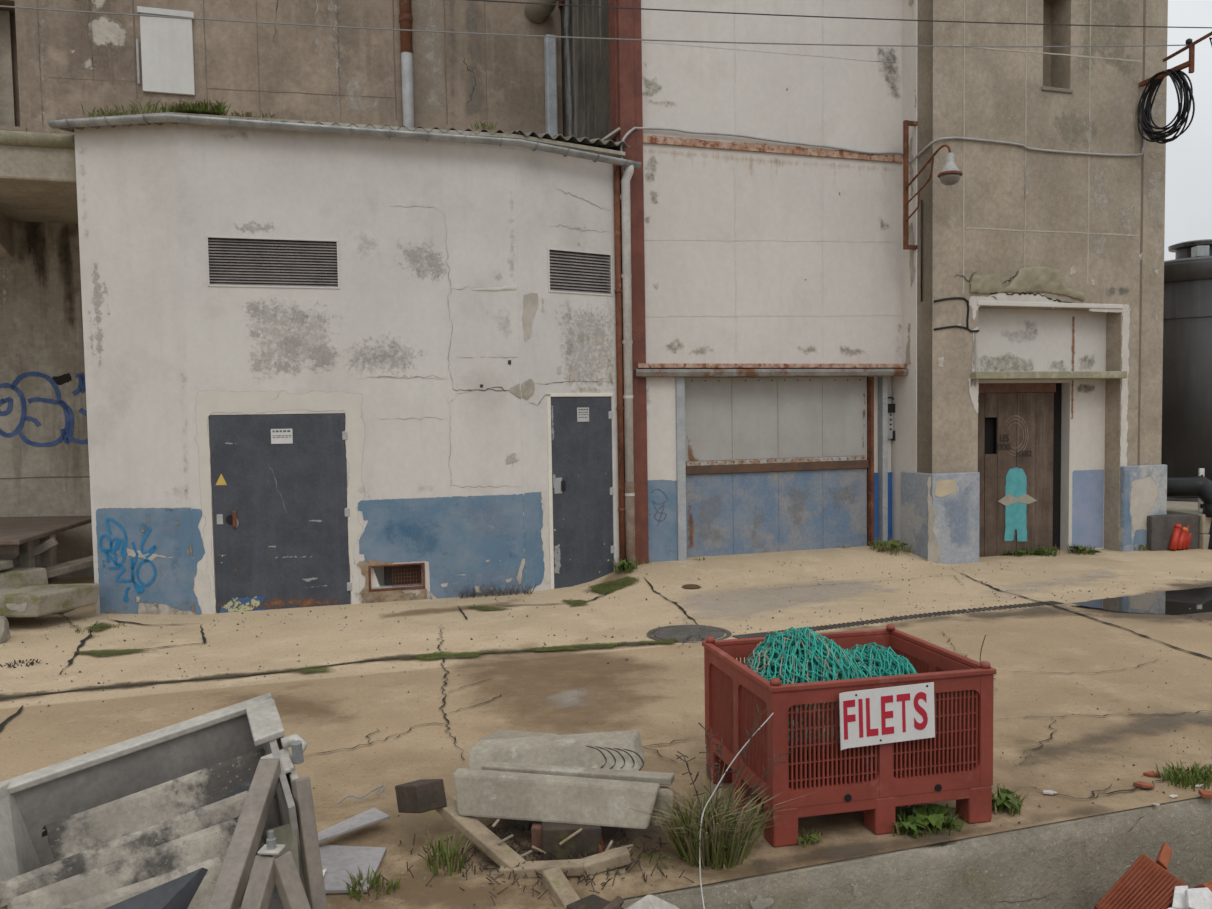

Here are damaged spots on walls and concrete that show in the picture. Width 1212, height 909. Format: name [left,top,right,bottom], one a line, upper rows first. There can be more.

peeling [85,0,126,70]
water stain [21,222,73,323]
crack [357,205,608,488]
peeling [522,293,545,342]
peeling [958,292,1064,414]
spalling [357,559,466,604]
peeling [475,558,525,593]